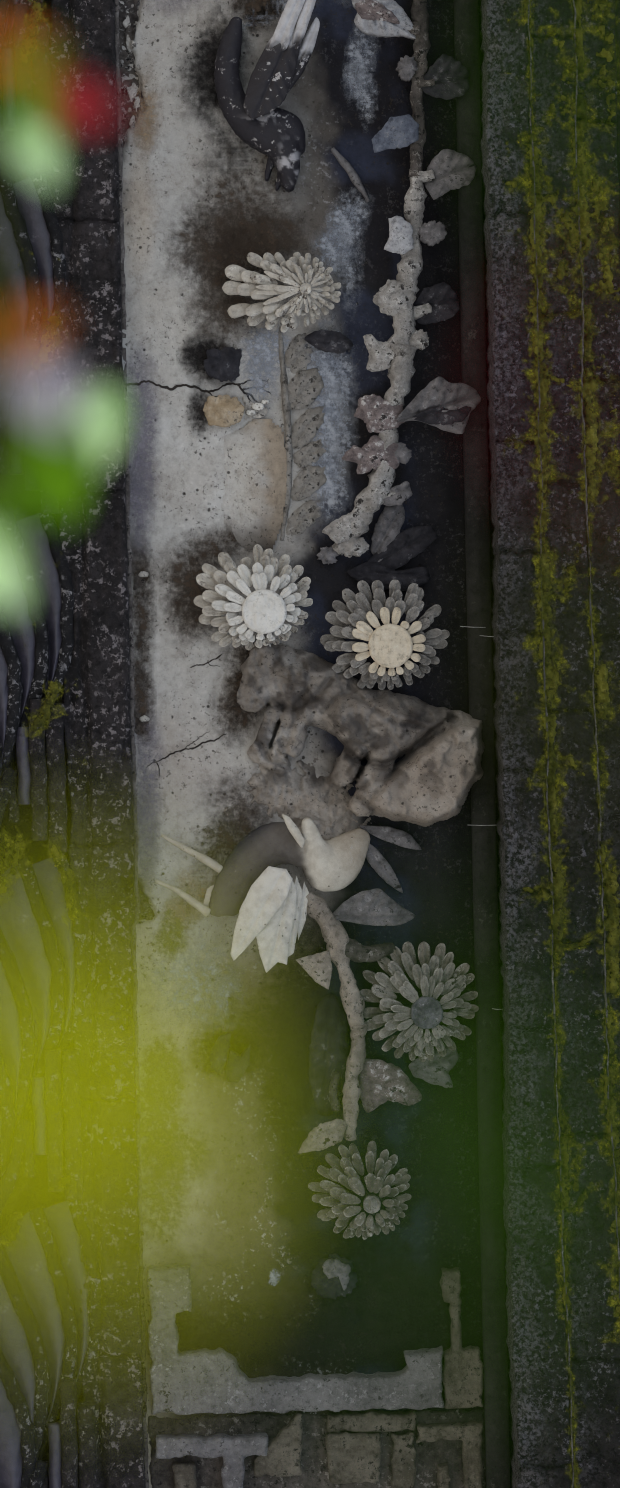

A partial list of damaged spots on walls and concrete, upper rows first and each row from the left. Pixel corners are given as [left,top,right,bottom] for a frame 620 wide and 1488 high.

crack [124,378,271,403]